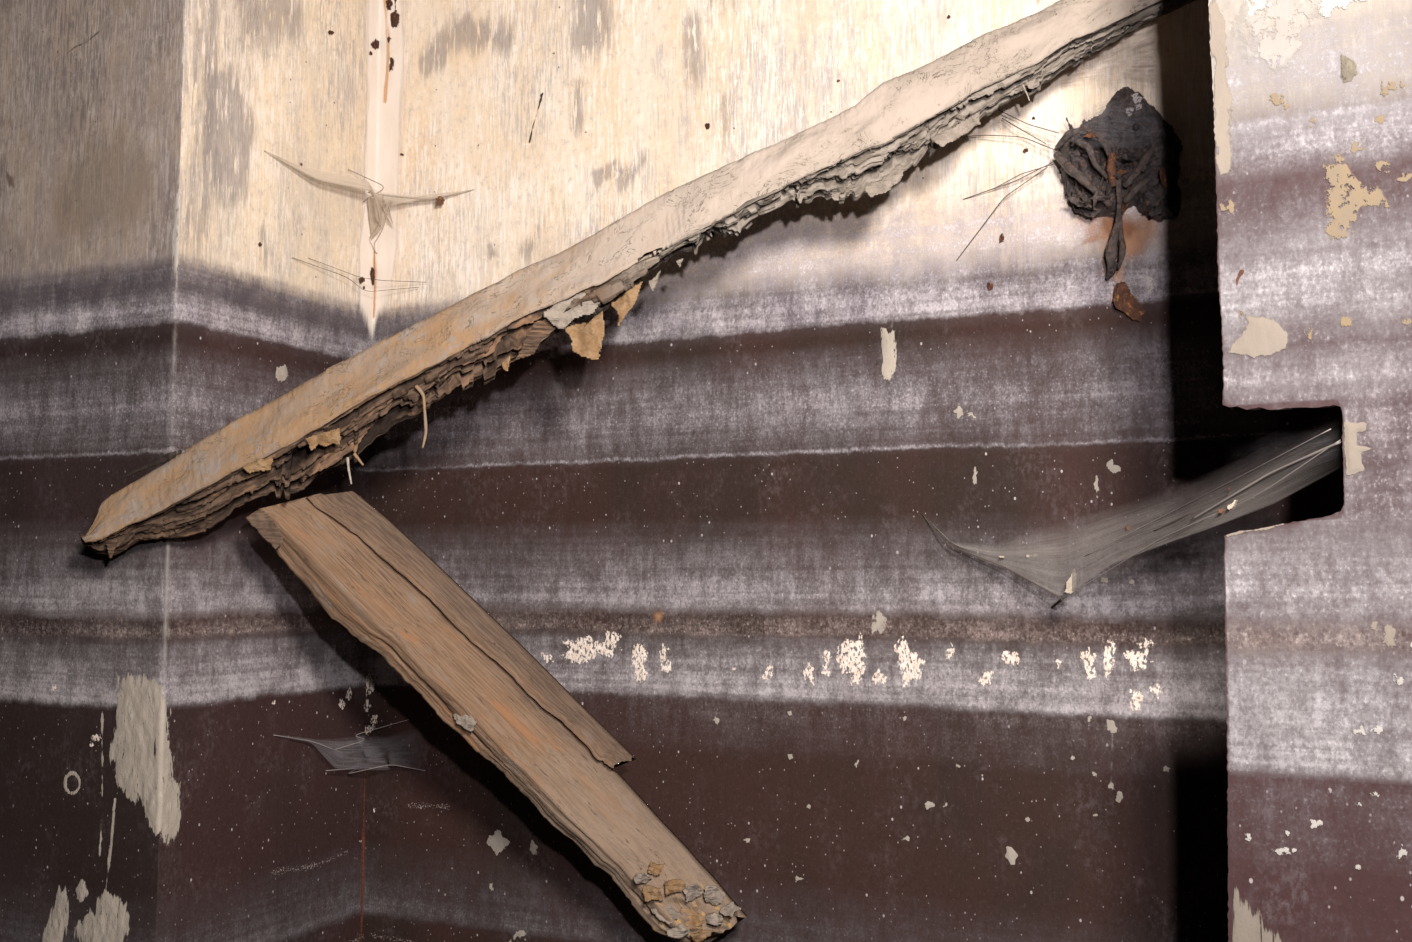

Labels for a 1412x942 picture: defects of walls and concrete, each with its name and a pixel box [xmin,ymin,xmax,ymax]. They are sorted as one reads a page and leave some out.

spalling [1341,55,1357,82]
peeling [1323,142,1412,239]
corrosion [1066,173,1152,321]
water stain [0,375,275,459]
water stain [337,173,1412,779]
water stain [0,563,409,706]
peeling [541,631,673,682]
peeling [803,633,925,687]
peeling [978,651,1020,687]
peeling [1080,638,1157,680]
peeling [1129,683,1161,712]
peeling [1005,846,1018,865]